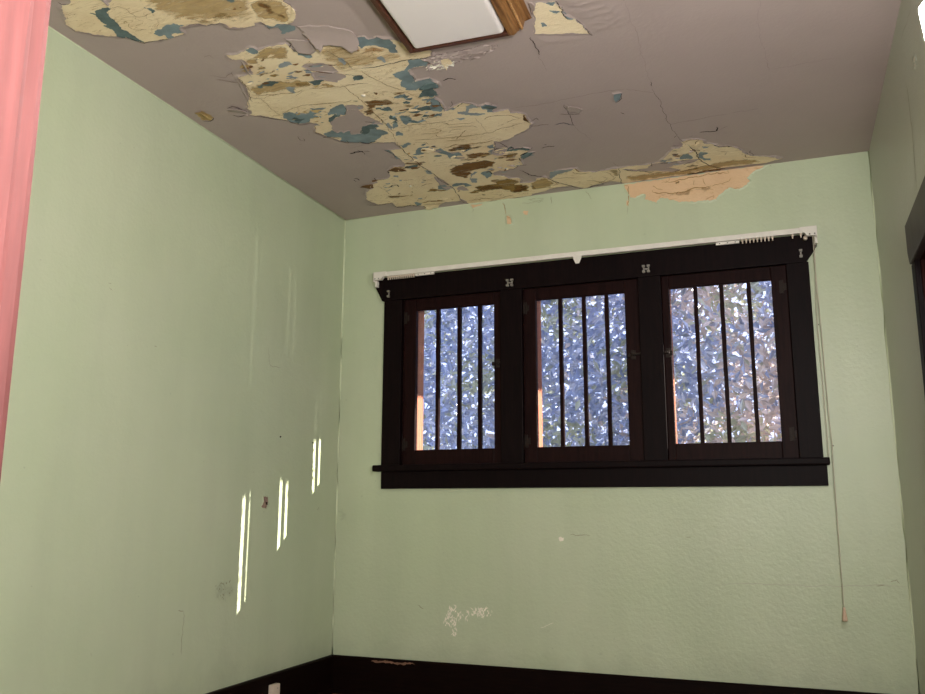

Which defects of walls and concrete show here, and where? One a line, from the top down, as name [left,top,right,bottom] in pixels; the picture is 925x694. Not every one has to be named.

peeling [56,0,784,227]